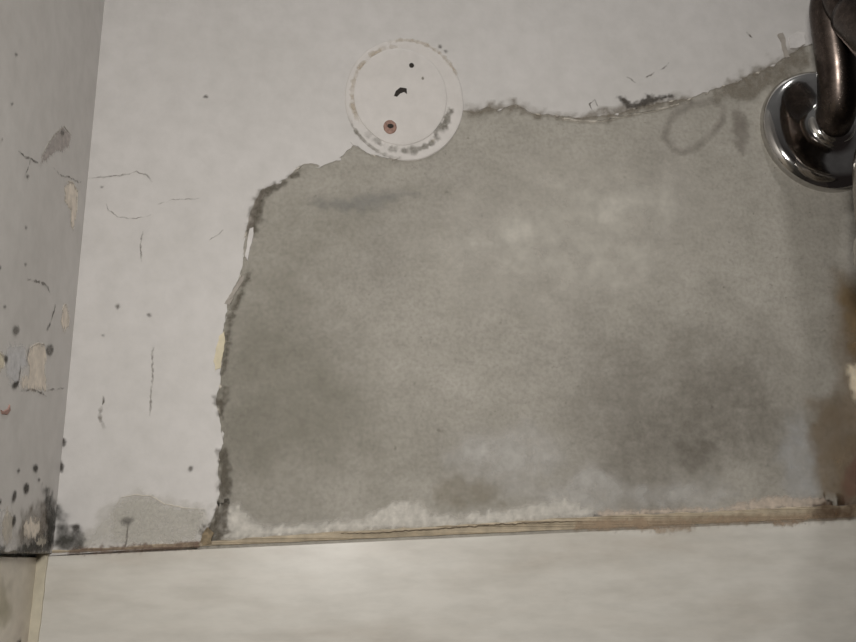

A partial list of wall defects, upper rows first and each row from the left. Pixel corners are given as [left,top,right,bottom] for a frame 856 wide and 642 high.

flaking render [21,126,71,170]
peeling [198,31,856,549]
peeling [0,342,54,395]
mould [12,465,82,555]